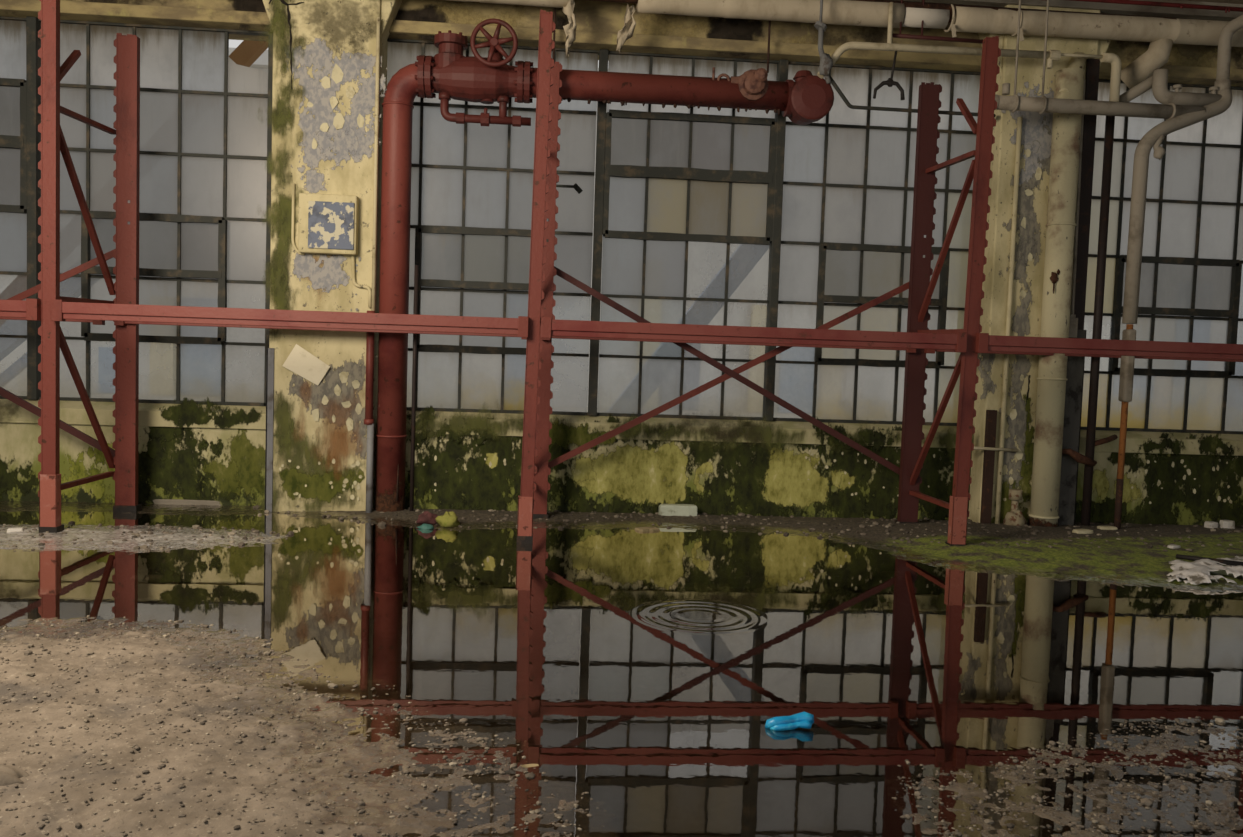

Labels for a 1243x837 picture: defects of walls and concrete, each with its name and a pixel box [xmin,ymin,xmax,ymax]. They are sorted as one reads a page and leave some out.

peeling [285,38,387,194]
peeling [1003,116,1052,336]
peeling [290,253,361,311]
water stain [0,458,39,501]
water stain [138,397,262,506]
peeling [279,353,377,503]
water stain [405,406,524,511]
water stain [547,414,902,519]
water stain [918,427,956,520]
peeling [977,353,1032,503]
water stain [1075,433,1243,526]